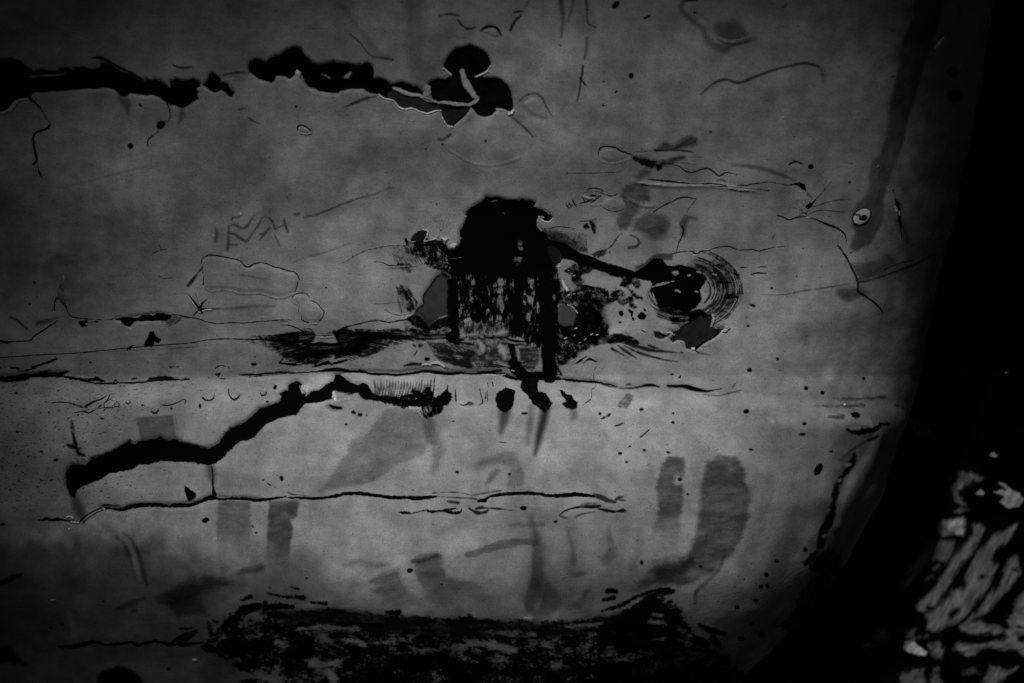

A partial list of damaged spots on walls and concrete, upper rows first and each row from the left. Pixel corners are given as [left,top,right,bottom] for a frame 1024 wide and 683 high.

spalling [0,56,234,113]
spalling [248,45,514,127]
spalling [405,229,461,249]
crack [639,162,883,312]
crack [0,298,414,415]
crack [215,363,520,380]
spalling [414,273,449,327]
spalling [558,275,598,343]
crack [555,376,735,405]
spalling [654,312,730,353]
crack [38,466,626,523]
damp [645,458,747,585]